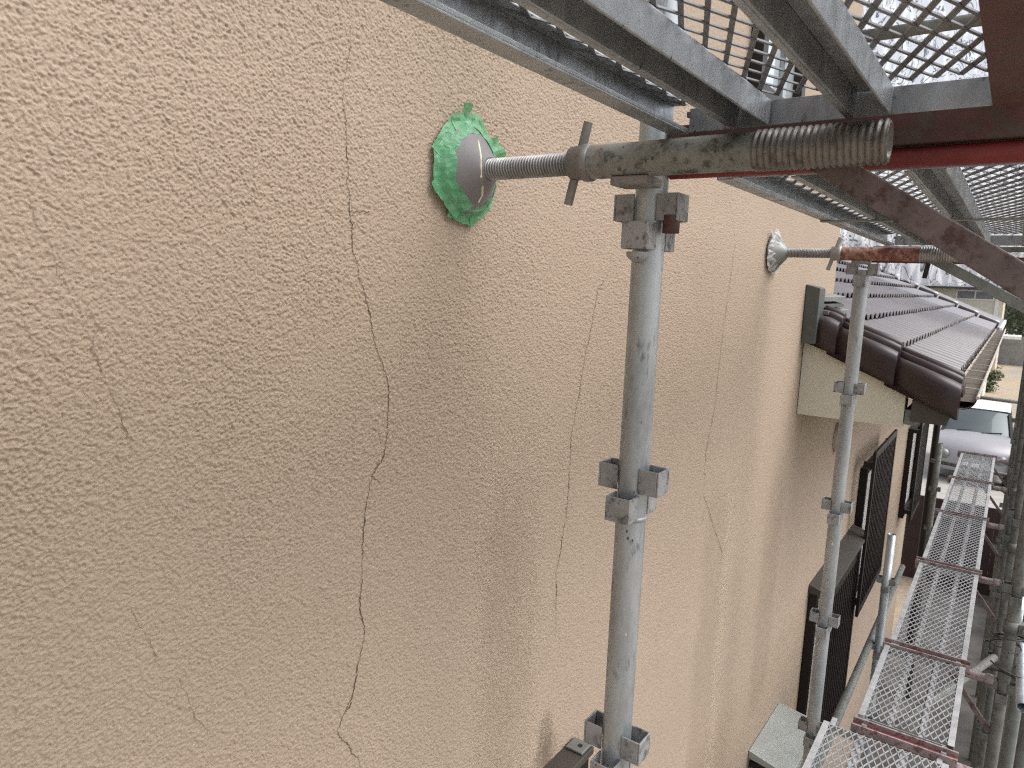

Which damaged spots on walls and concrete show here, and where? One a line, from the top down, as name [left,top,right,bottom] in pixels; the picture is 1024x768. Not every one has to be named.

crack [337,23,390,768]